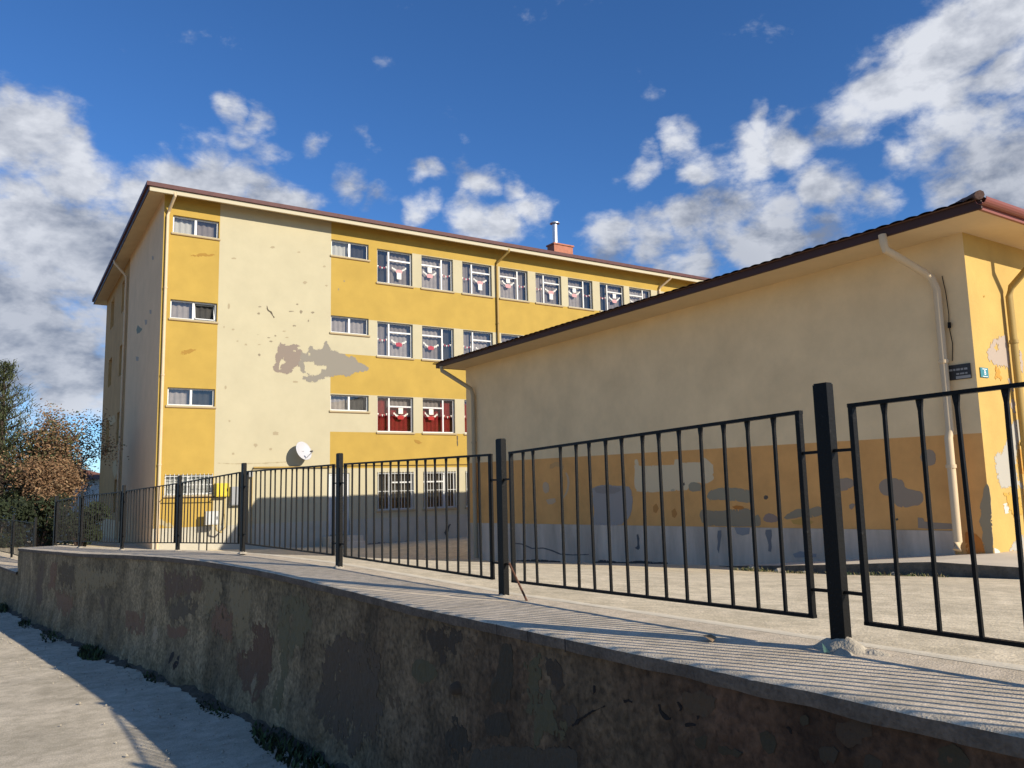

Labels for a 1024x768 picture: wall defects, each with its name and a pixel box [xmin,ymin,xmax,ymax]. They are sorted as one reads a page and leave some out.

peeling [223,325,369,383]
peeling [979,334,1024,554]
peeling [634,458,714,492]